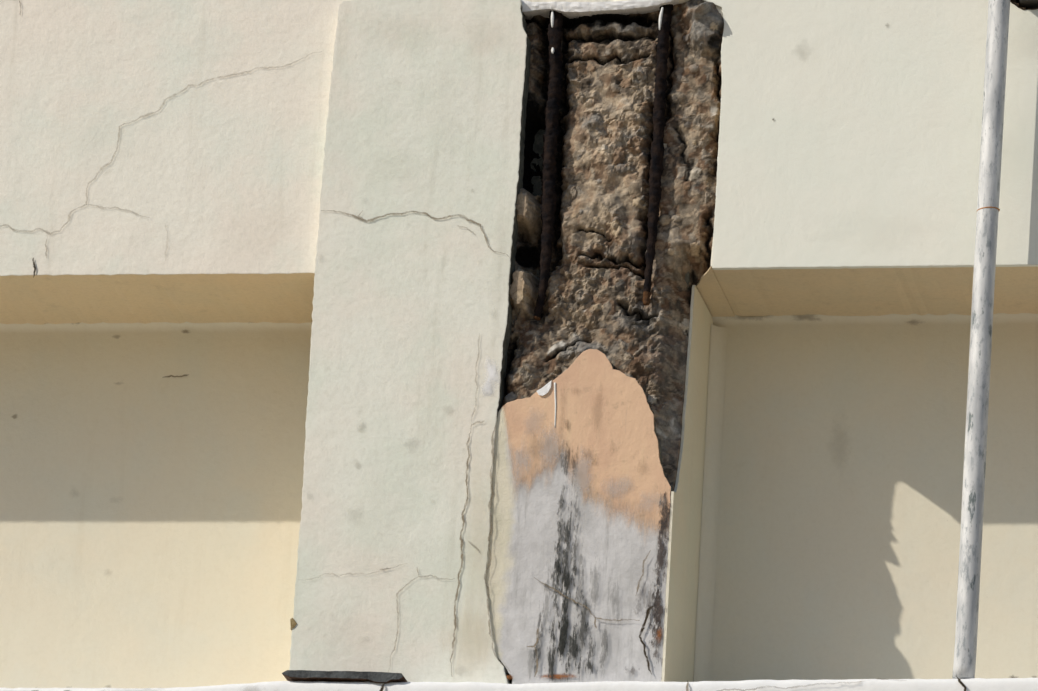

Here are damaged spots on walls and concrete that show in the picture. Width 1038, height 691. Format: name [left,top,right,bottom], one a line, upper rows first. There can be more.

crack [327,210,509,257]
spalling [483,0,724,684]
crack [450,425,494,674]
leakage [534,485,598,680]
leakage [648,494,670,659]